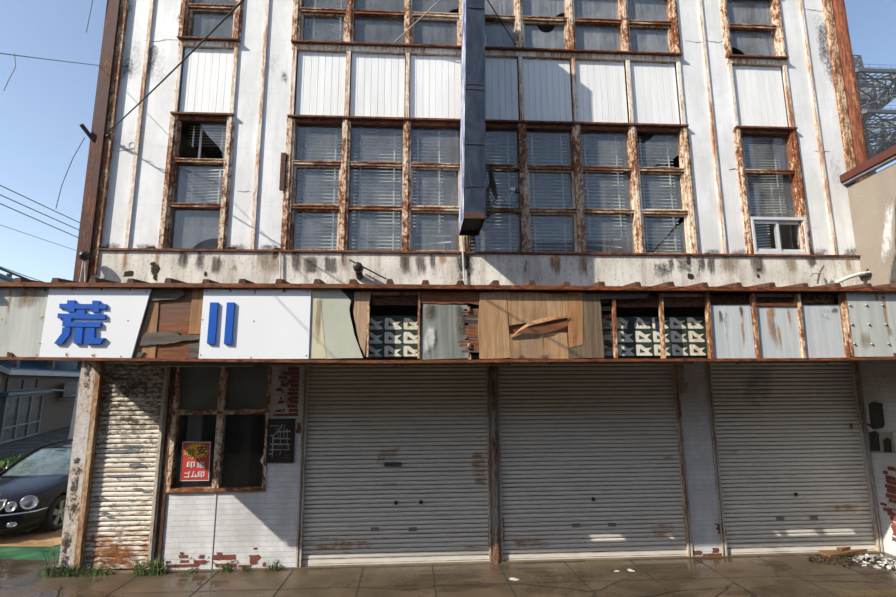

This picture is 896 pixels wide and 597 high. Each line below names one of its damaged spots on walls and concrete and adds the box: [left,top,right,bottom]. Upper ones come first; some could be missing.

water stain [881,206,896,283]
water stain [291,253,346,272]
water stain [400,254,435,272]
water stain [457,255,472,279]
peeling [273,366,301,434]
peeling [880,466,896,542]
peeling [166,548,266,568]